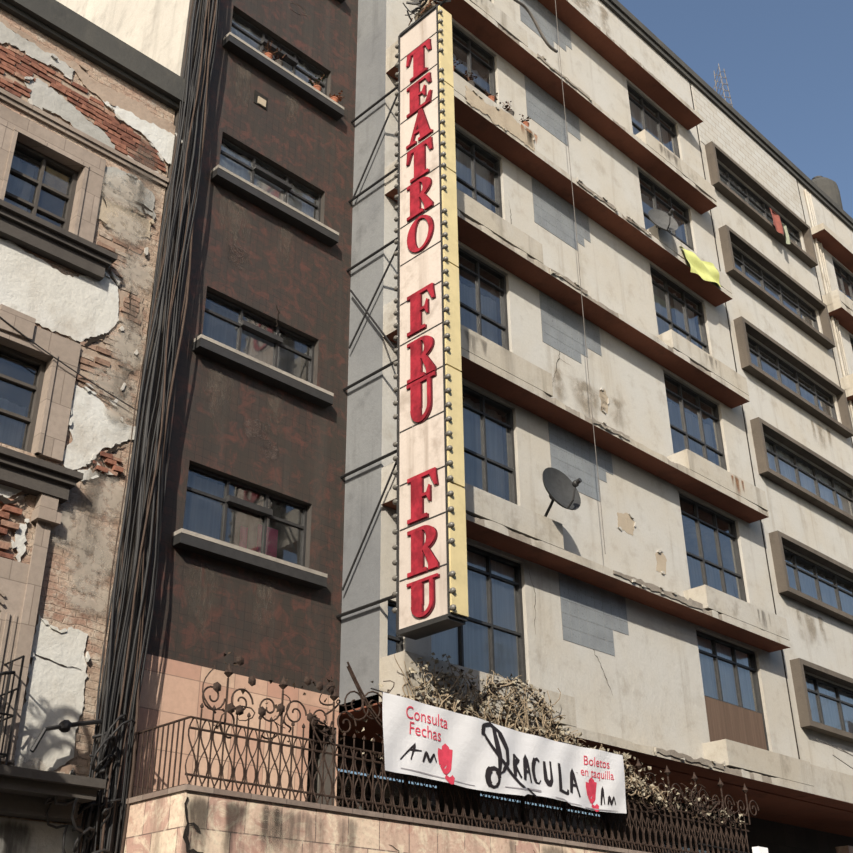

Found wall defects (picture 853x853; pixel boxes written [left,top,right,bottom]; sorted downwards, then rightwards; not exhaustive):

flaking render [0,17,183,175]
peeling [0,167,156,482]
flaking render [0,484,29,562]
peeling [617,512,636,536]
crack [183,797,203,853]